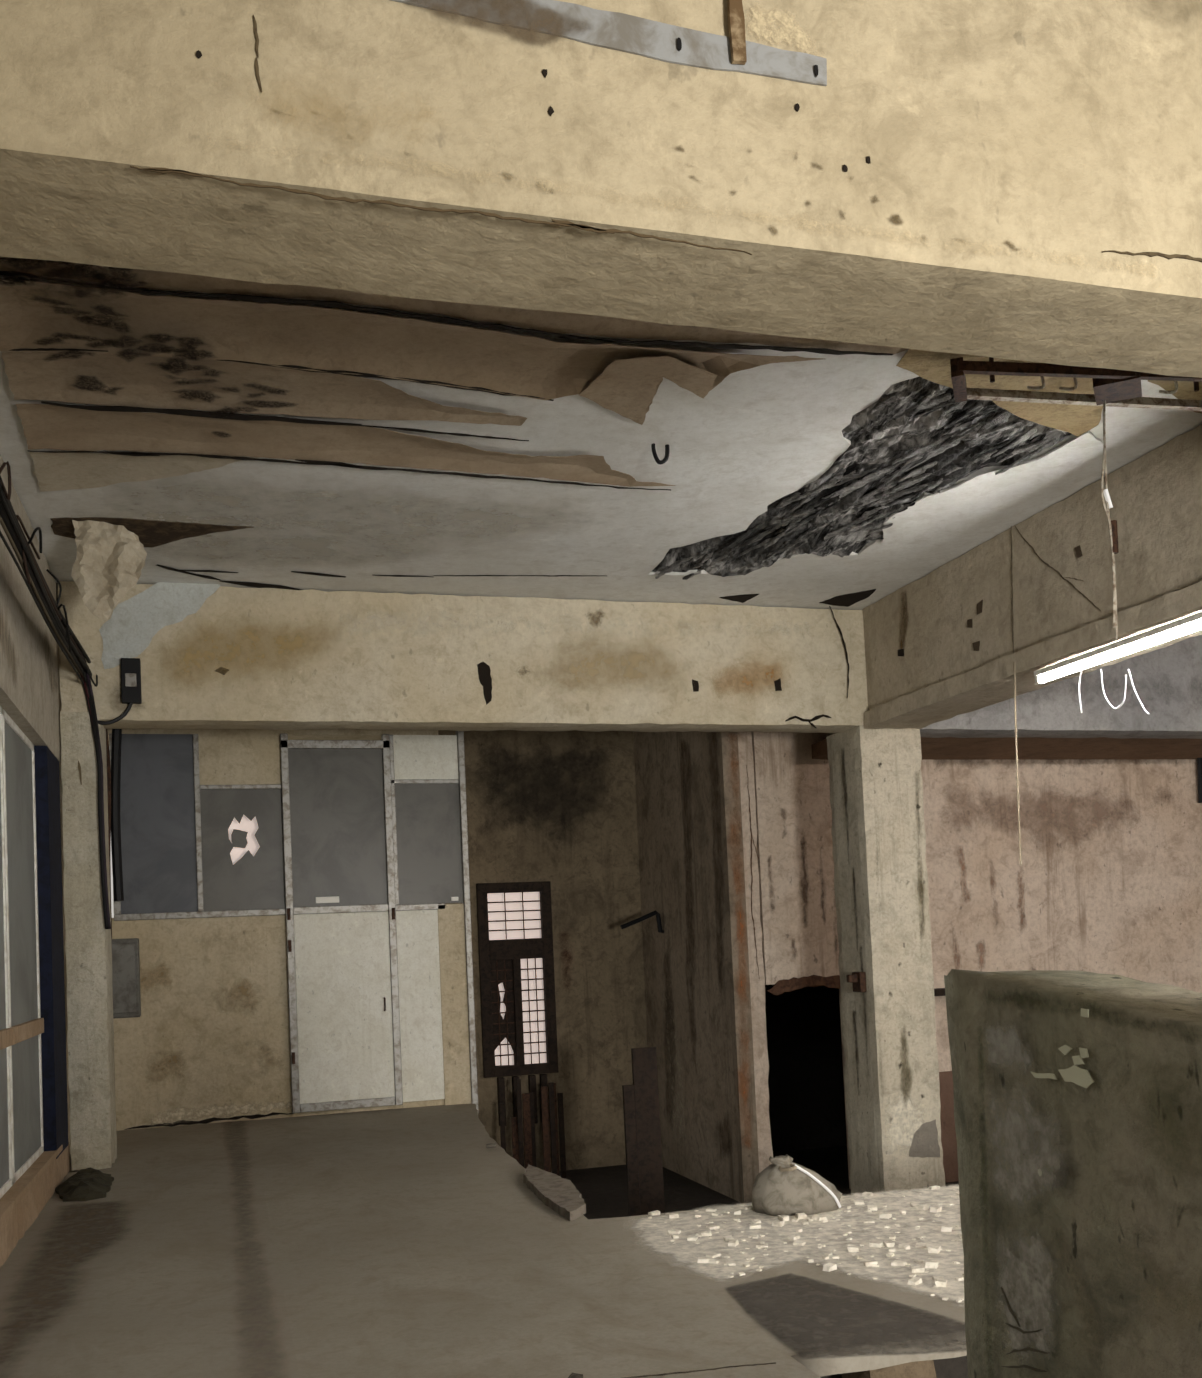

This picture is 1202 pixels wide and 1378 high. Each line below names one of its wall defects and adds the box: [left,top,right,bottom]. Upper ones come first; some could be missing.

crack [130,166,752,255]
crack [1102,250,1202,262]
crack [0,271,893,355]
leakage [0,256,295,437]
crack [220,360,554,401]
peeling [0,256,1103,580]
peeling [1148,380,1202,414]
peeling [50,517,254,669]
spalling [719,594,759,603]
spalling [819,589,876,607]
flaking render [967,600,983,651]